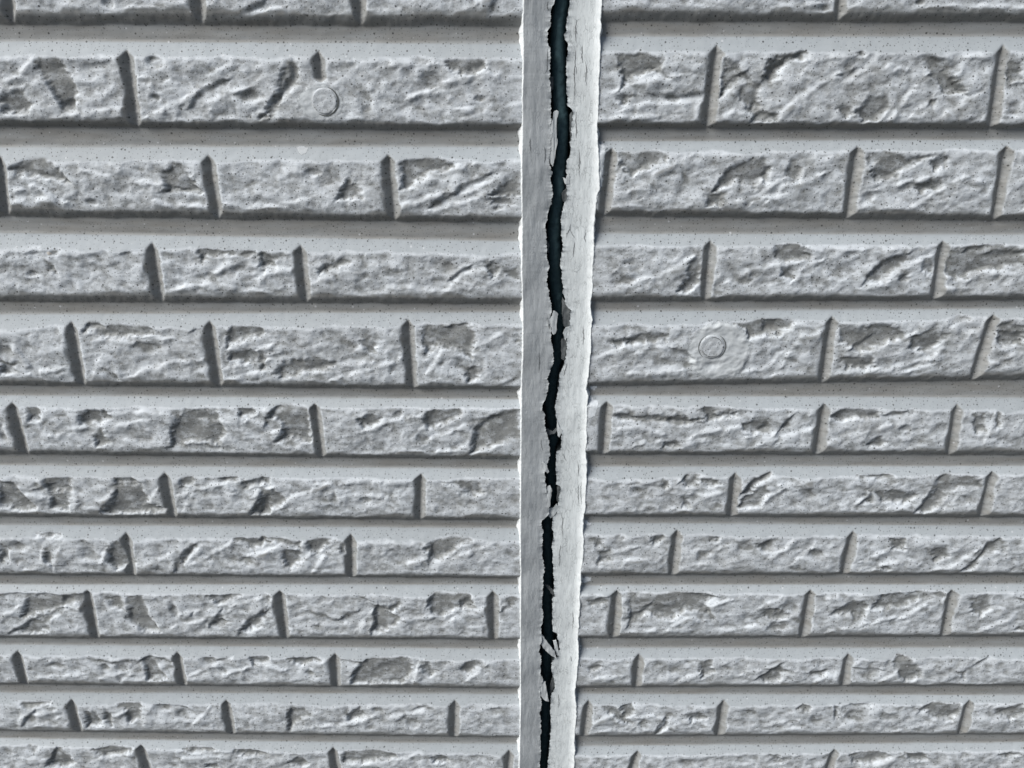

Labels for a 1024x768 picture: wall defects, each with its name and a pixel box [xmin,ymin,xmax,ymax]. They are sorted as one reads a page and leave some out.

crack [529,0,587,768]